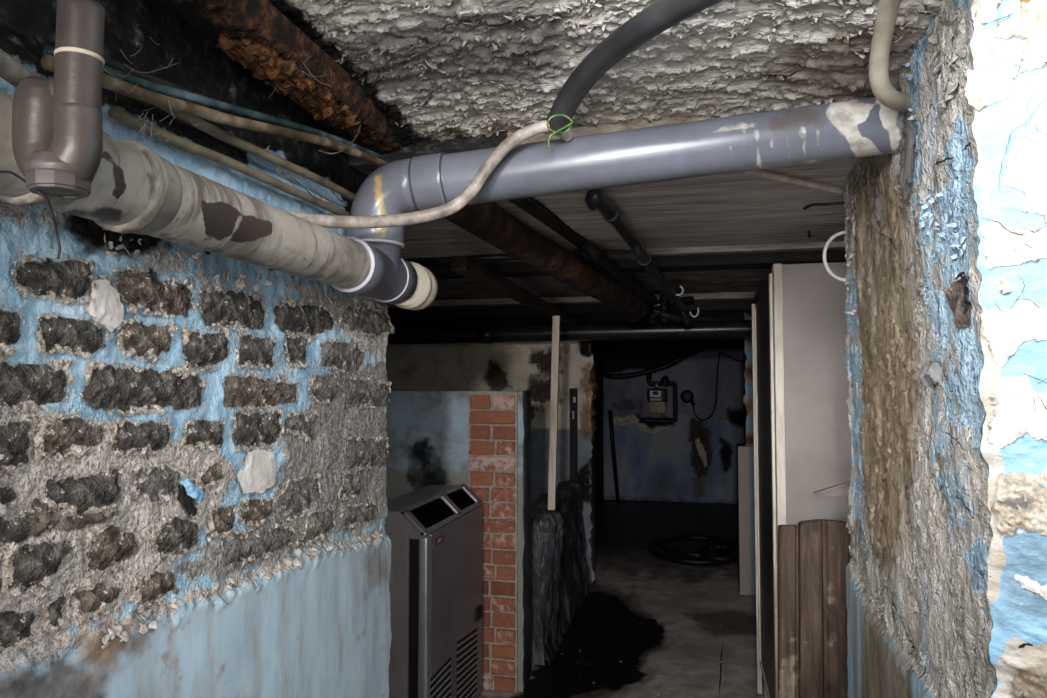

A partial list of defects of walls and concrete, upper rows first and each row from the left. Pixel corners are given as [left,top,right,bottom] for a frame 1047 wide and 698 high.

corrosion [216,31,362,137]
peeling [847,18,876,42]
peeling [904,0,1047,111]
peeling [919,191,967,259]
peeling [944,132,1047,448]
damp [526,348,563,419]
spalling [0,228,395,655]
damp [689,418,733,497]
spalling [1011,665,1047,698]